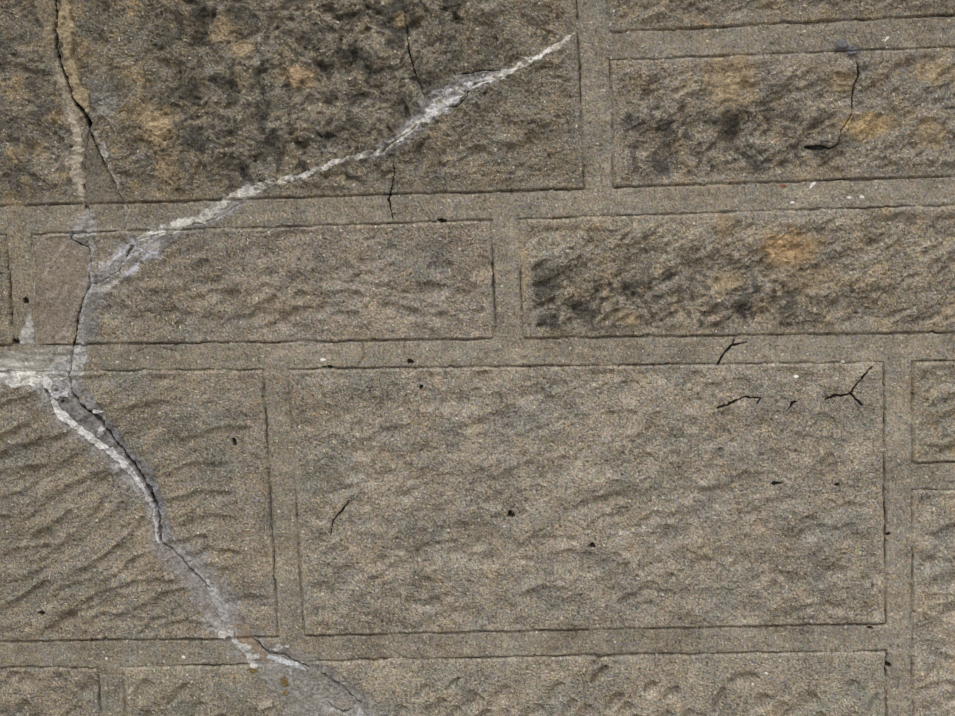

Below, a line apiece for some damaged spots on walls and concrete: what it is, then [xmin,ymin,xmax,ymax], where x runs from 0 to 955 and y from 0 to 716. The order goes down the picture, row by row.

damp [136,106,178,180]
damp [289,67,313,87]
crack [804,69,859,151]
crack [0,0,576,716]
crack [825,368,871,405]
spalling [255,648,377,716]